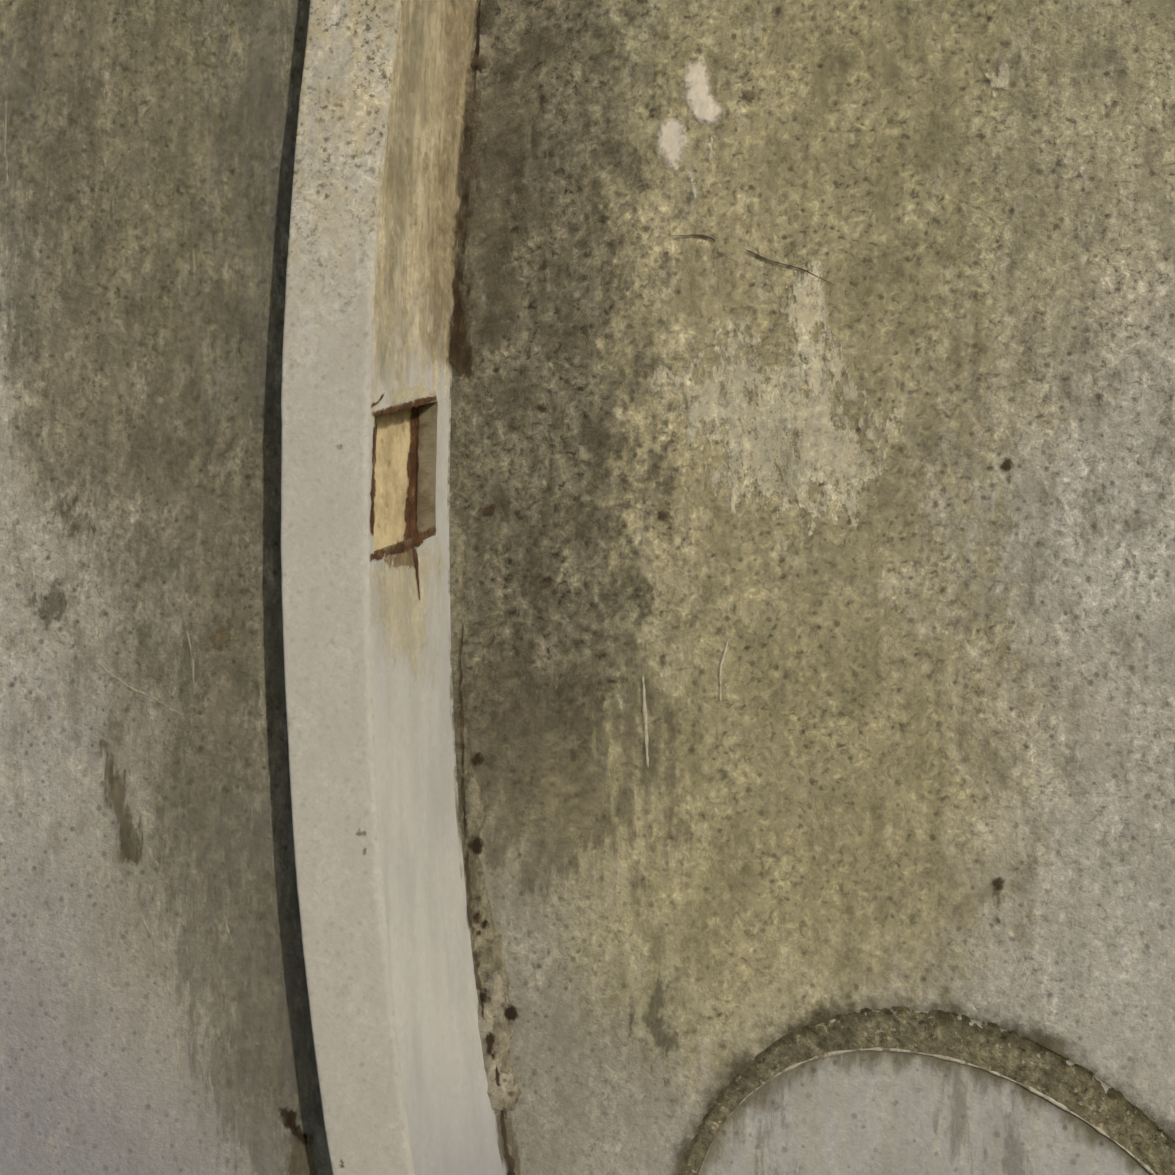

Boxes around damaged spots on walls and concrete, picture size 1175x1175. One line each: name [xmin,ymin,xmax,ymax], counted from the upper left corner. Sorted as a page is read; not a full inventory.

peeling [985,62,1009,97]
rust [448,1,489,375]
spalling [447,0,905,786]
rust [370,392,437,599]
spalling [469,837,484,854]
spalling [473,912,488,935]
spalling [505,1005,519,1020]
spalling [486,1032,494,1055]
rust [280,1108,317,1175]